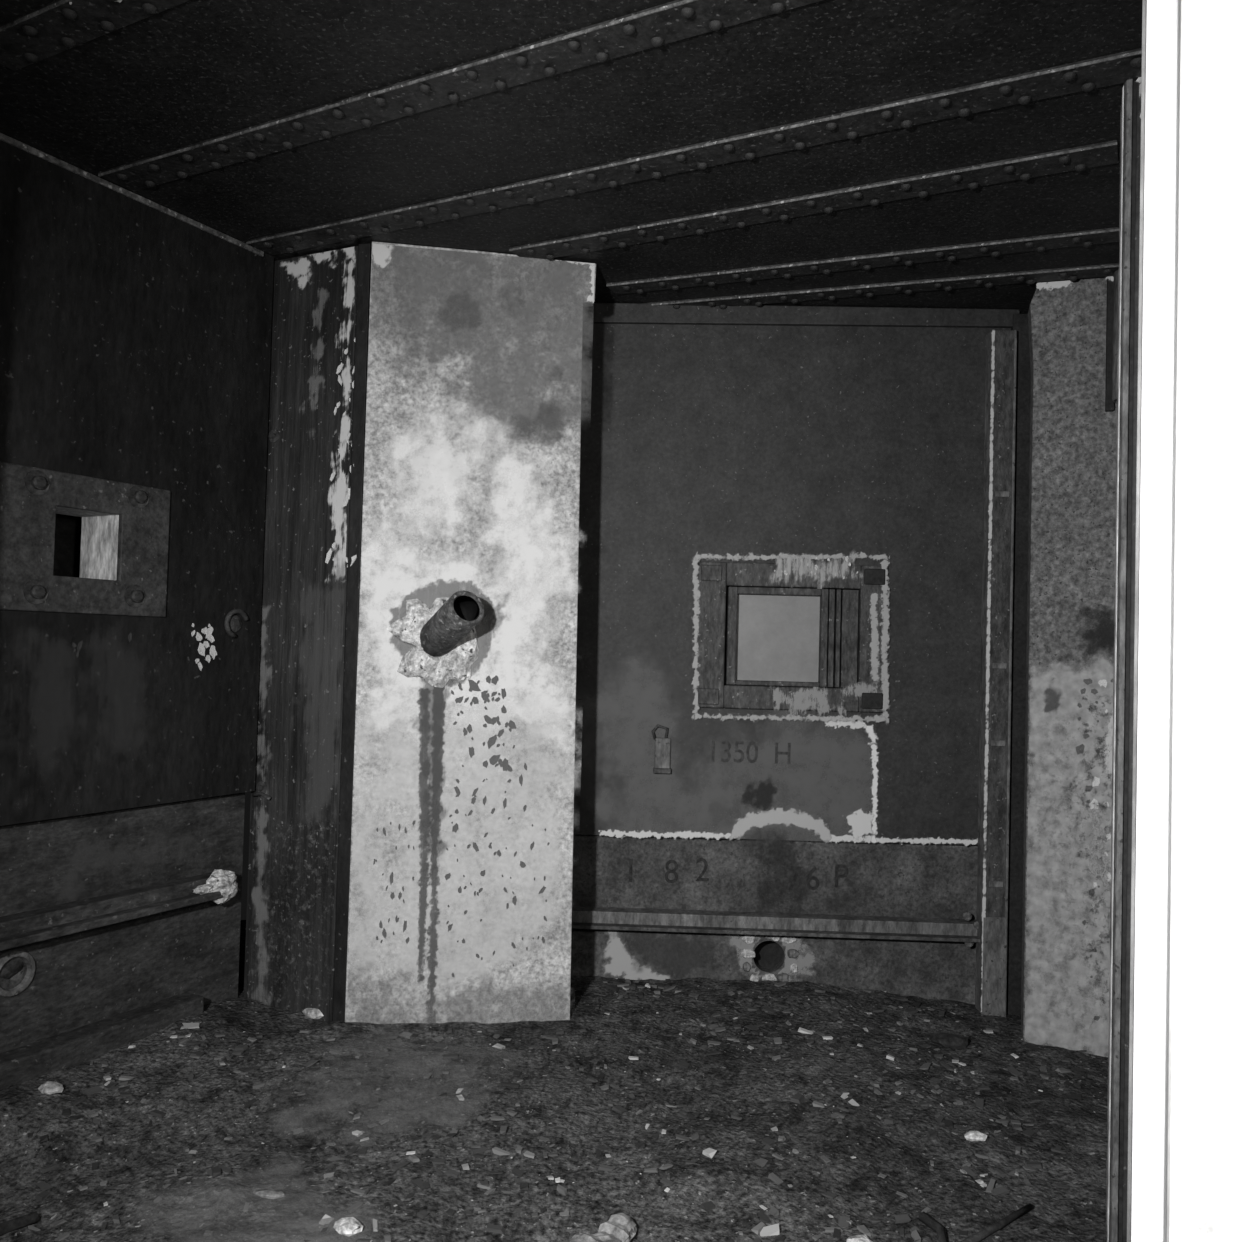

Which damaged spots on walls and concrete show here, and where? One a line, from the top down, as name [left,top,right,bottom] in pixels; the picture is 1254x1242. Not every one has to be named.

peeling [281,247,357,580]
peeling [191,623,217,670]
rust [390,580,502,1024]
peeling [599,330,995,1012]
damp [1044,688,1061,712]
damp [1083,608,1115,654]